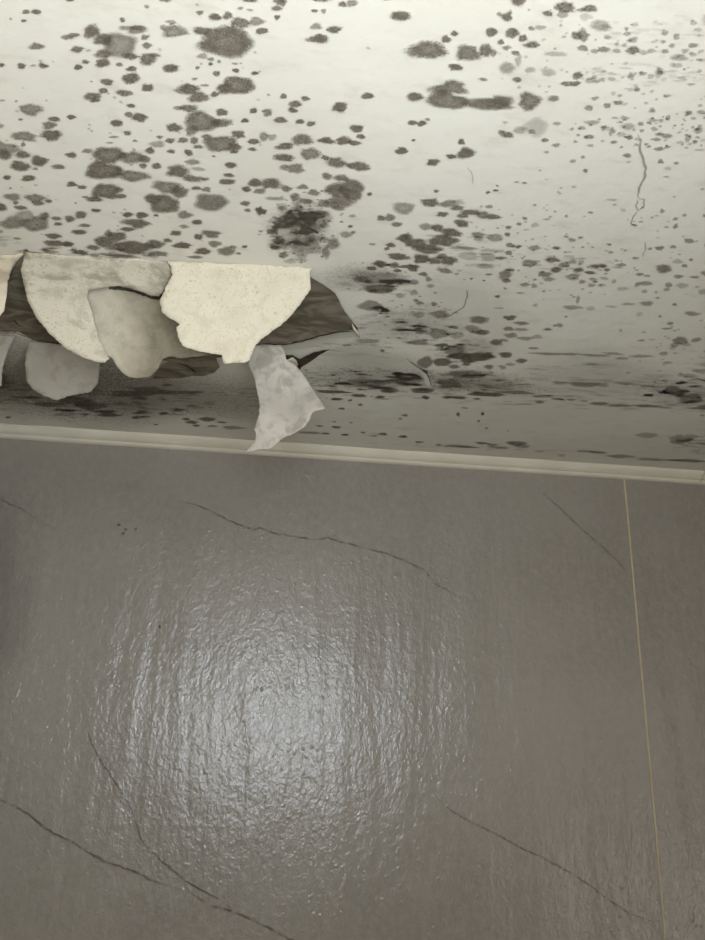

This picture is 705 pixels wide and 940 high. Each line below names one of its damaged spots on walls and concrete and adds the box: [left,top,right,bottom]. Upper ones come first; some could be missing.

damp [390,11,411,21]
damp [407,0,558,110]
damp [543,2,596,16]
damp [561,72,583,87]
damp [572,28,589,50]
damp [0,0,372,259]
damp [427,139,474,166]
damp [356,190,598,317]
damp [0,350,248,427]
peeling [0,251,361,452]
damp [316,379,397,410]
damp [407,315,527,400]